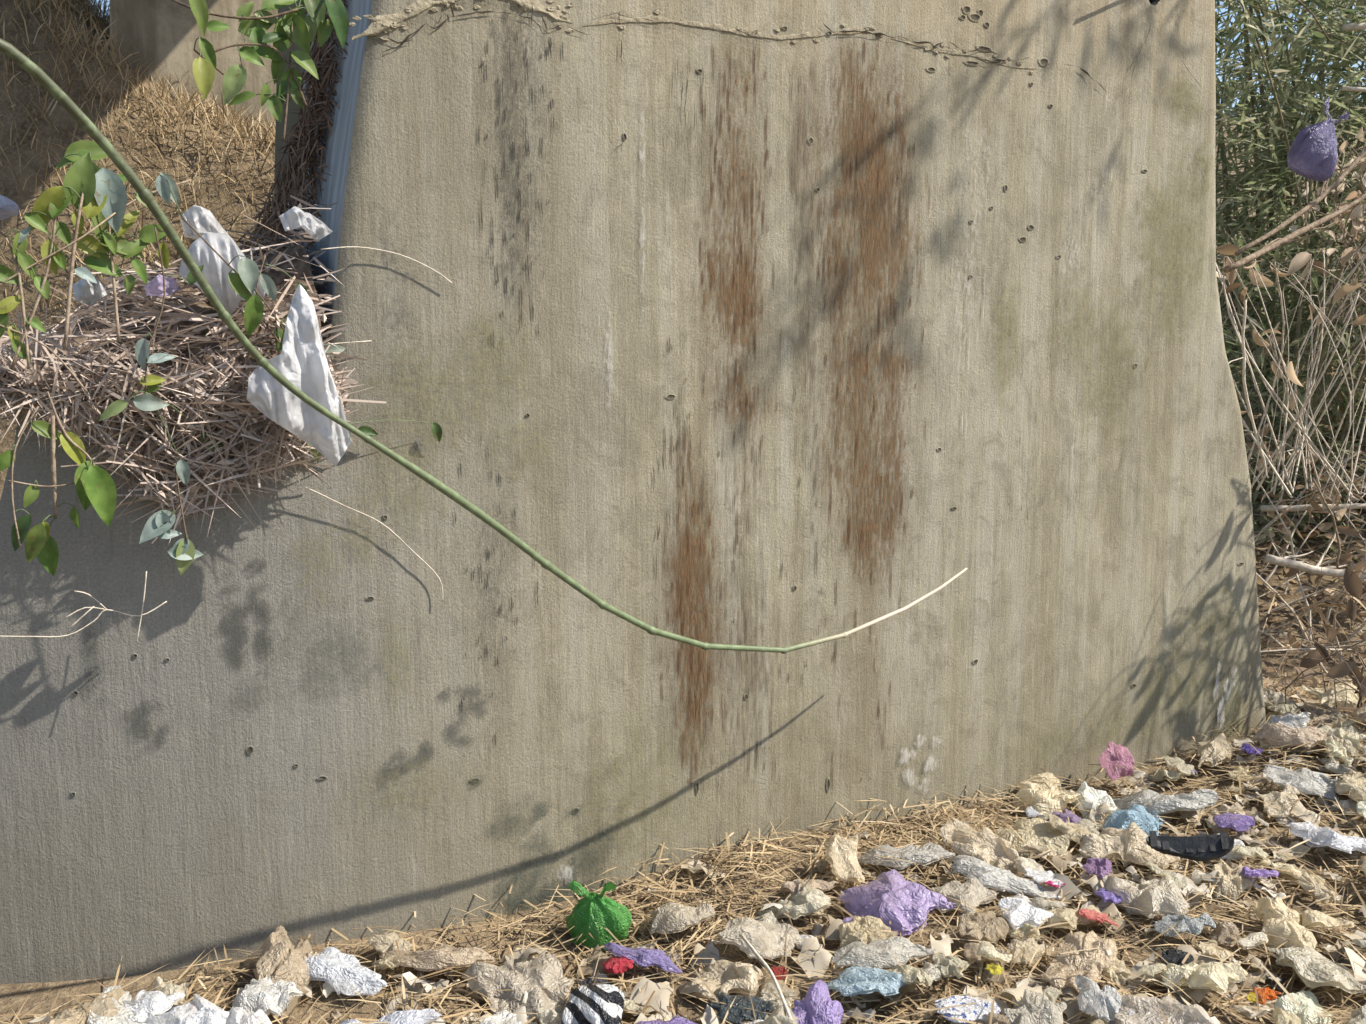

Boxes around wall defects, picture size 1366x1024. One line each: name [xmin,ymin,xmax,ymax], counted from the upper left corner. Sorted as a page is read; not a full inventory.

leakage [478,4,563,349]
crack [370,4,770,63]
corrosion [693,44,781,486]
corrosion [809,41,930,602]
crack [823,23,1151,94]
leakage [465,535,518,664]
corrosion [656,416,725,783]
leakage [508,849,601,912]